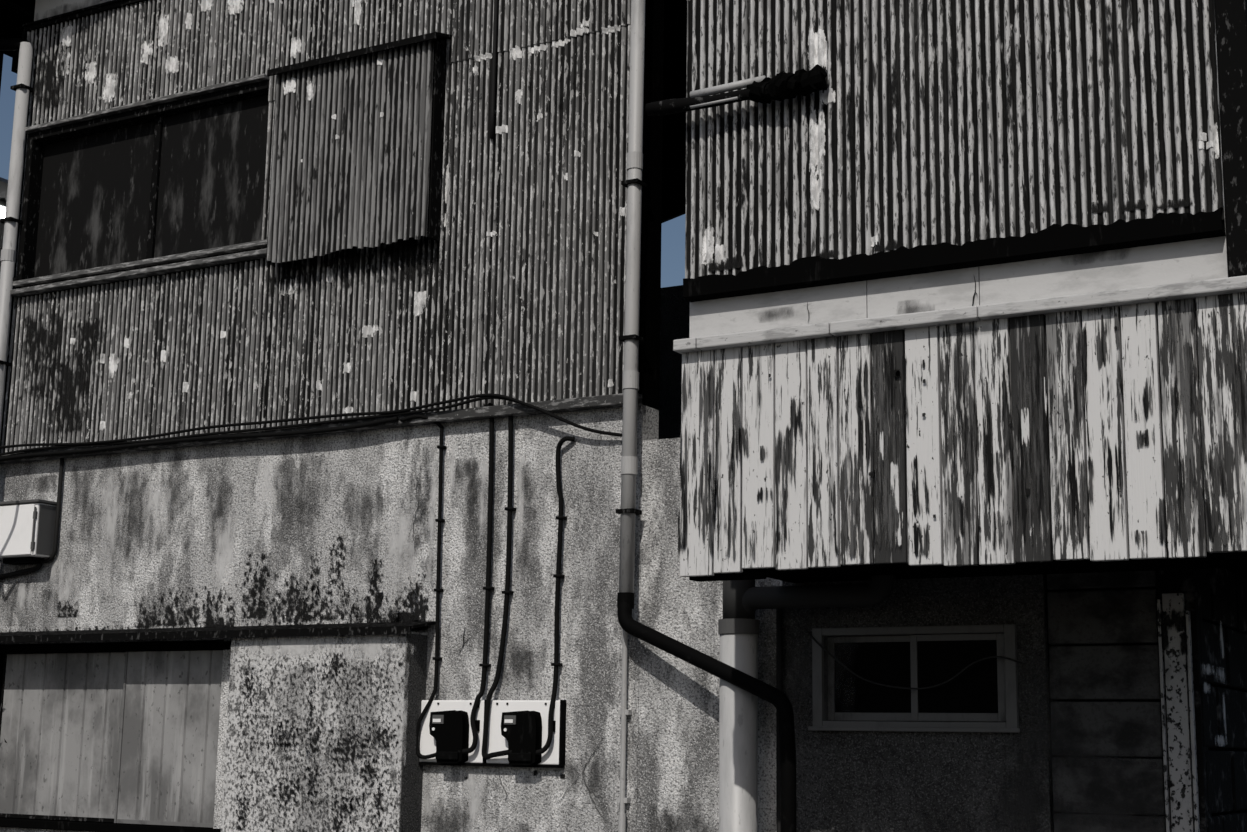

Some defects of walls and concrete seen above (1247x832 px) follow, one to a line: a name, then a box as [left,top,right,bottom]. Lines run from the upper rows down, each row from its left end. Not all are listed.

water stain [451,451,487,523]
water stain [518,459,529,510]
peeling [678,344,929,560]
peeling [944,305,1247,550]
water stain [6,455,436,832]
water stain [427,774,480,832]